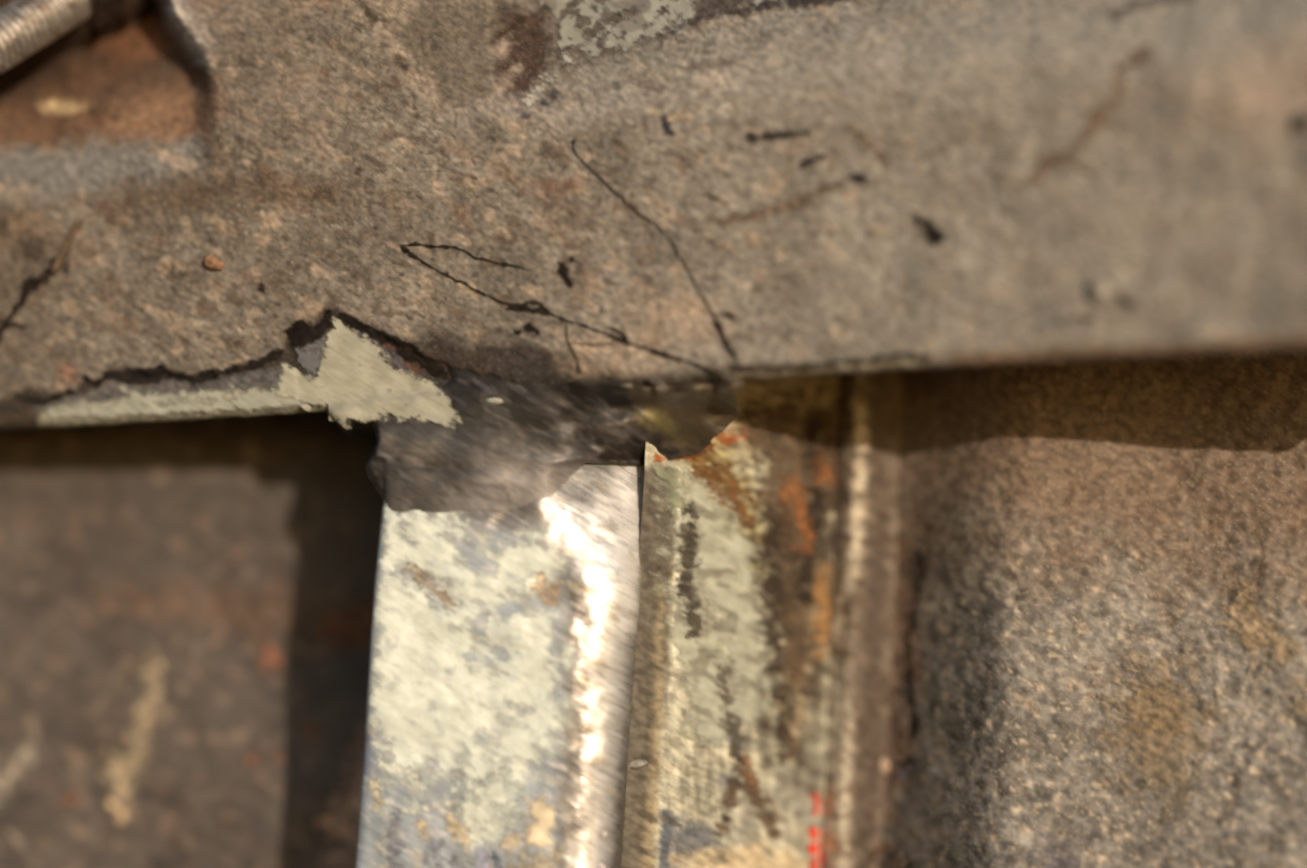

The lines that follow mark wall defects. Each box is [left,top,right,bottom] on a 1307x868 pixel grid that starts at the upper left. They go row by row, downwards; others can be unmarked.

peeling [519,0,841,119]
crack [0,221,83,346]
crack [400,139,739,375]
peeling [18,309,462,429]
peeling [368,506,576,868]